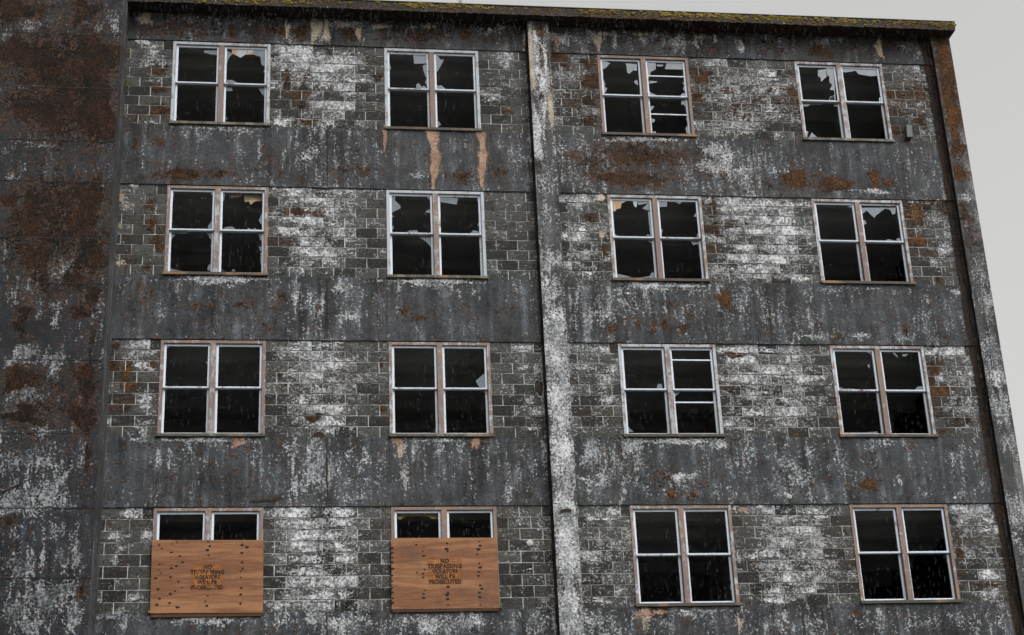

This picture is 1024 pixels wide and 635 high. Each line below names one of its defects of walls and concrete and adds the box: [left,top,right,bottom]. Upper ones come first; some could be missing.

corrosion [425,131,443,189]
corrosion [475,132,487,190]
corrosion [920,37,1024,635]